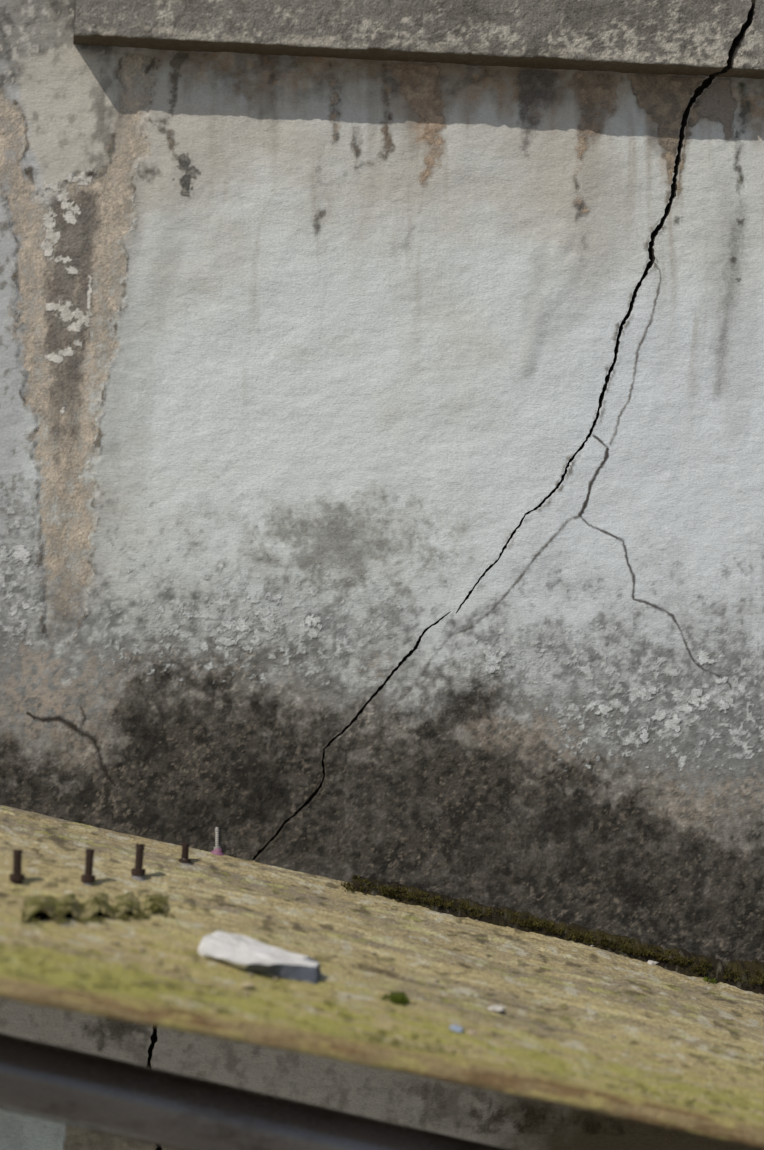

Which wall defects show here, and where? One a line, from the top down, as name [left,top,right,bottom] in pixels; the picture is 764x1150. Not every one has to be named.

leakage [149,53,188,157]
leakage [330,64,370,168]
leakage [381,92,394,156]
leakage [383,63,445,183]
leakage [734,83,750,183]
leakage [574,180,589,218]
peeling [0,53,160,646]
crack [253,0,756,860]
peeling [105,562,402,685]
crack [26,710,116,786]
leakage [0,672,764,962]
crack [147,1026,158,1067]